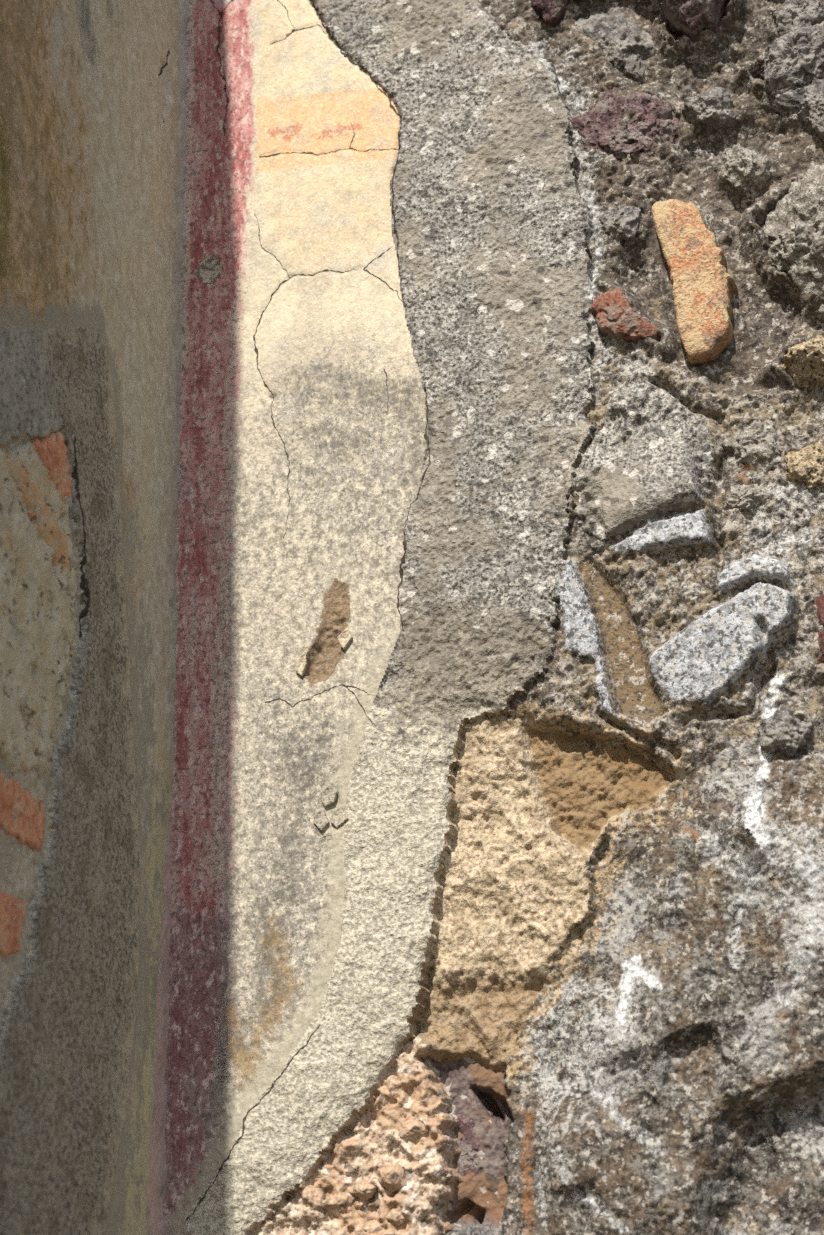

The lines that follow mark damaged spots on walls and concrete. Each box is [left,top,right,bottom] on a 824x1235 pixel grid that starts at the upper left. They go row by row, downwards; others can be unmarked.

crack [210,0,232,136]
crack [253,0,406,538]
crack [397,382,430,630]
spalling [0,431,88,1029]
crack [266,684,376,722]
spalling [295,578,353,687]
spalling [244,710,669,1235]
crack [186,1024,320,1220]